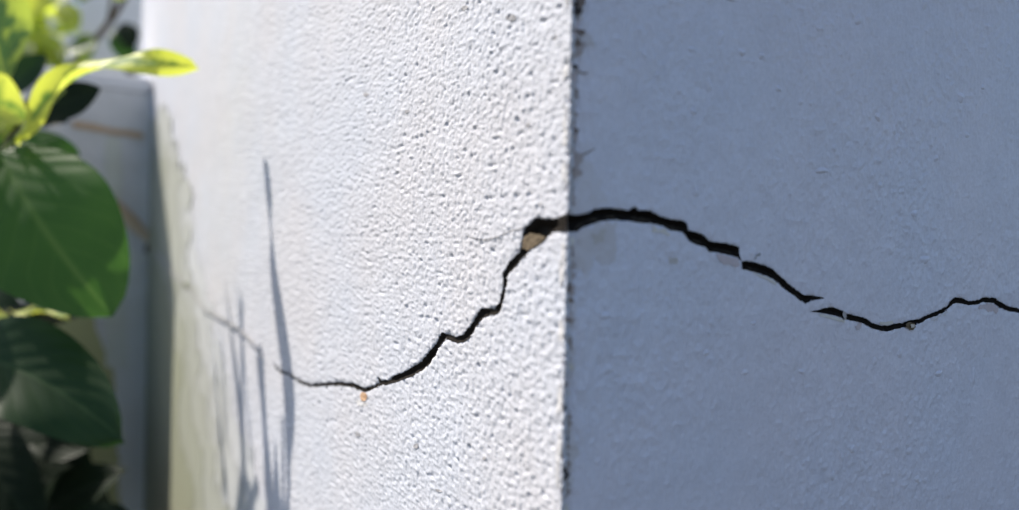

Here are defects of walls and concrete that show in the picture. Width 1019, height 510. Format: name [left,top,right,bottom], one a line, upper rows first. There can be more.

crack [153,207,1019,392]